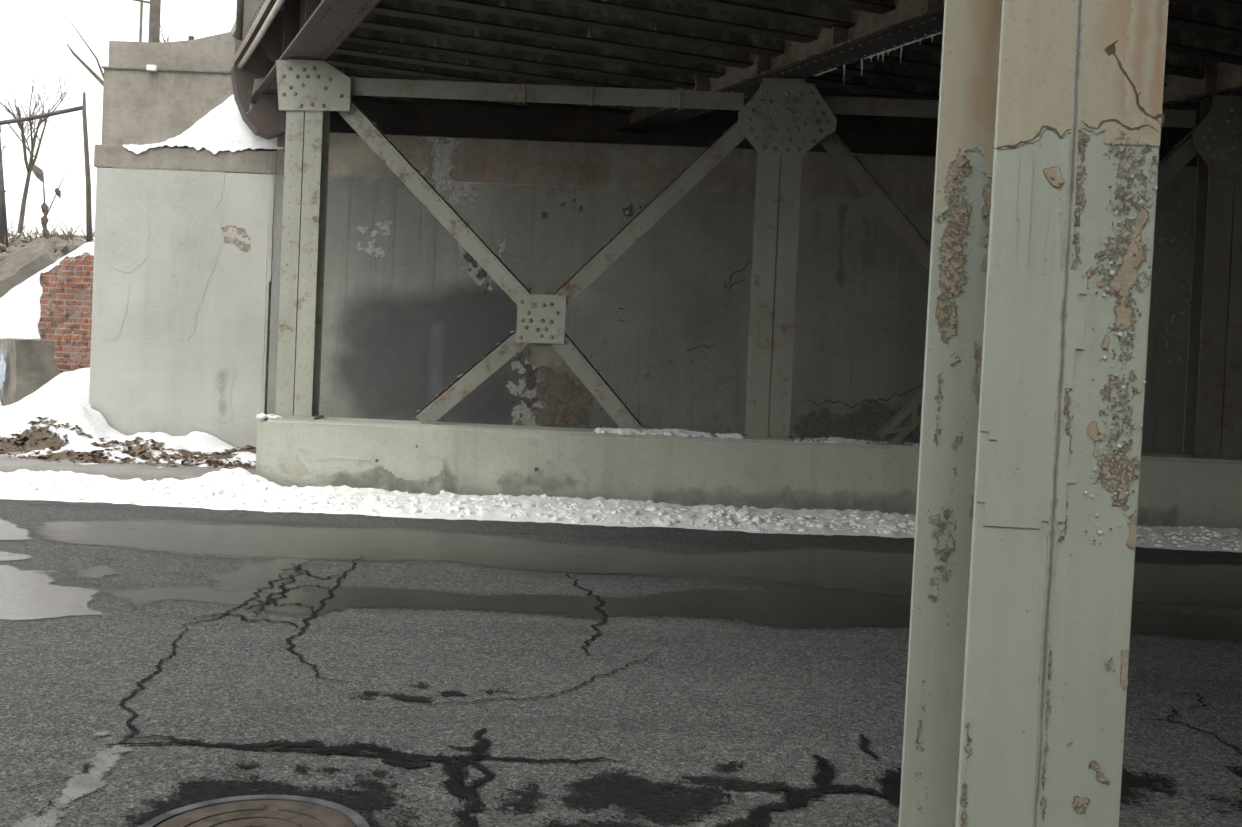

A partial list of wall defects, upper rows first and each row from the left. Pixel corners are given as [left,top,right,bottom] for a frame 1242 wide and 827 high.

crack [1105,41,1165,129]
spalling [221,225,251,252]
peeling [794,149,992,452]
peeling [993,119,1194,550]
spalling [505,346,603,428]
damp [491,455,598,500]
damp [645,479,917,516]
peeling [926,508,957,602]
damp [1137,496,1186,527]
crack [7,556,653,827]
crack [714,734,902,827]
peeling [960,722,973,827]